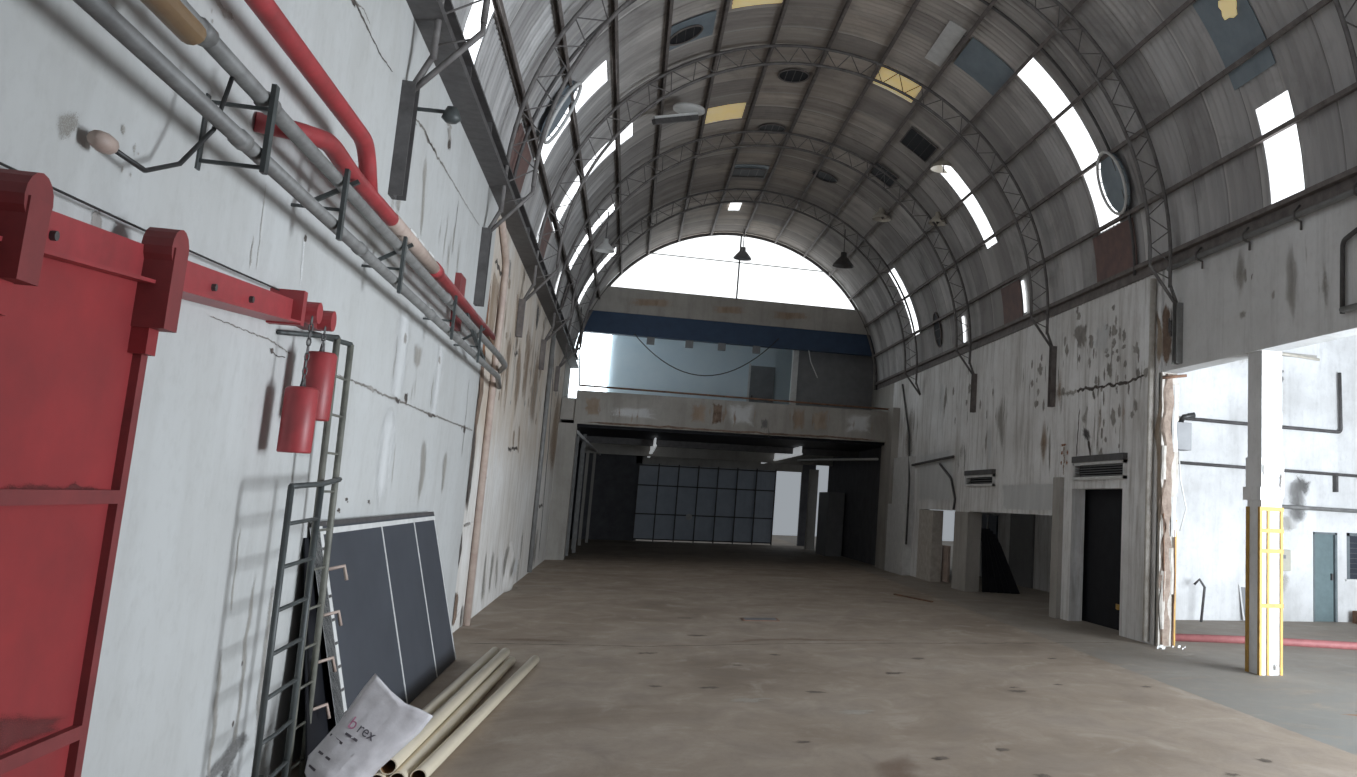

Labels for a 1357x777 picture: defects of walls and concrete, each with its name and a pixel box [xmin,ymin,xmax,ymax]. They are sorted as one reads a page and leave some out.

crack [351,0,393,72]
water stain [500,260,540,425]
water stain [549,390,561,470]
water stain [481,554,498,600]